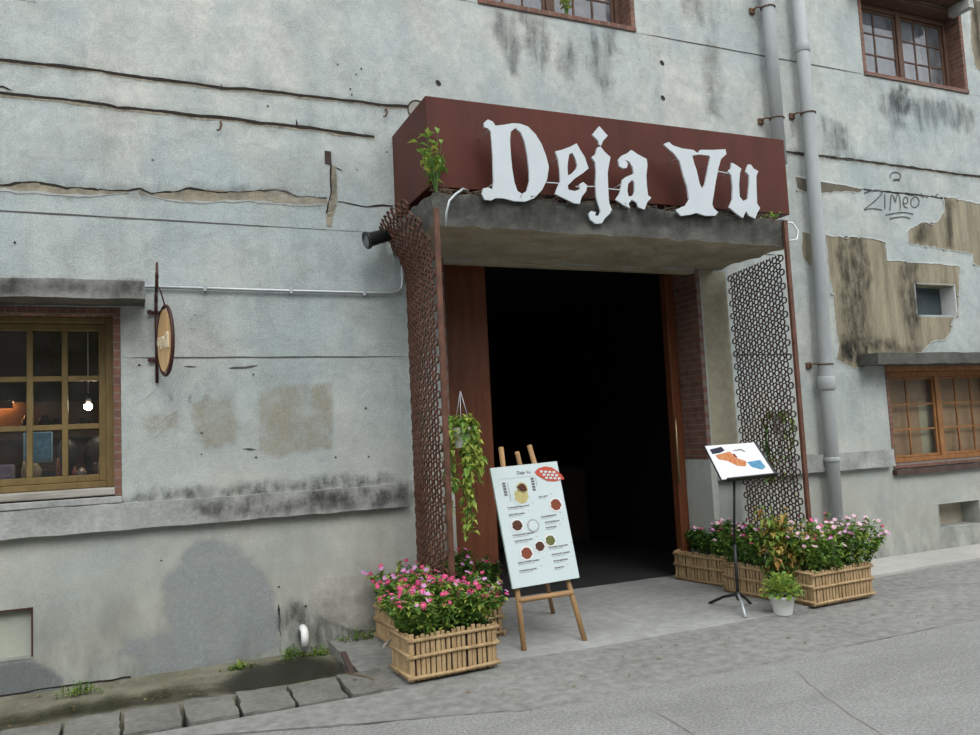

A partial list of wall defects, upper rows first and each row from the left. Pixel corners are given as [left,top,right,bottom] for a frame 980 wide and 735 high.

peeling [969,0,980,74]
crack [0,58,408,226]
peeling [800,231,812,268]
peeling [825,196,980,370]